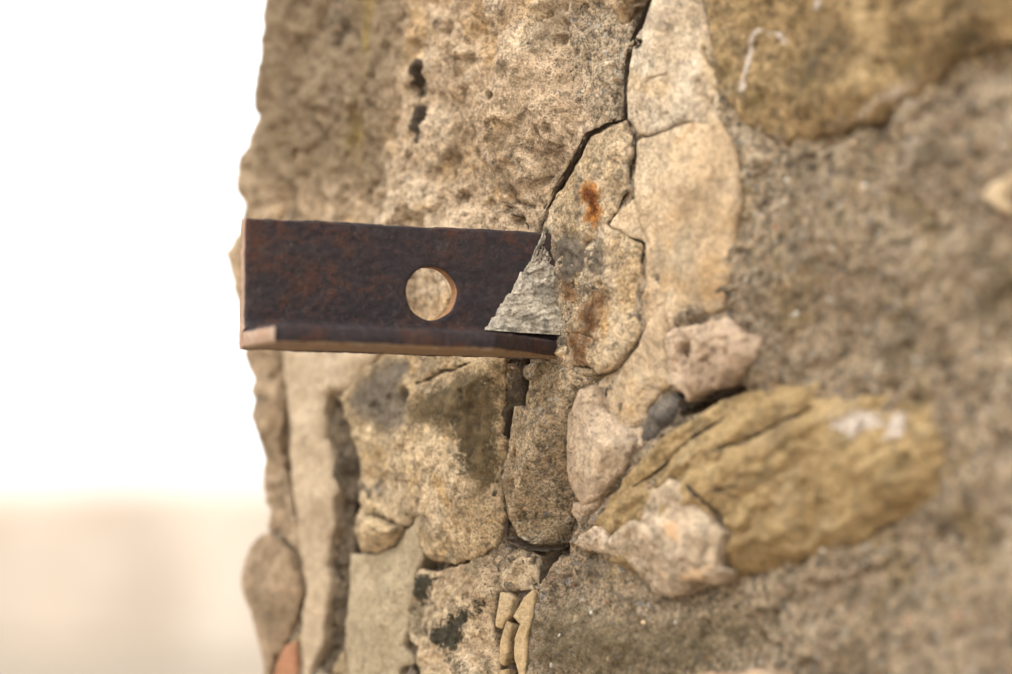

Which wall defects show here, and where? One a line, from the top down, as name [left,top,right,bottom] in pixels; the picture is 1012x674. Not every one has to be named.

crack [505,0,652,230]
rust [581,181,603,228]